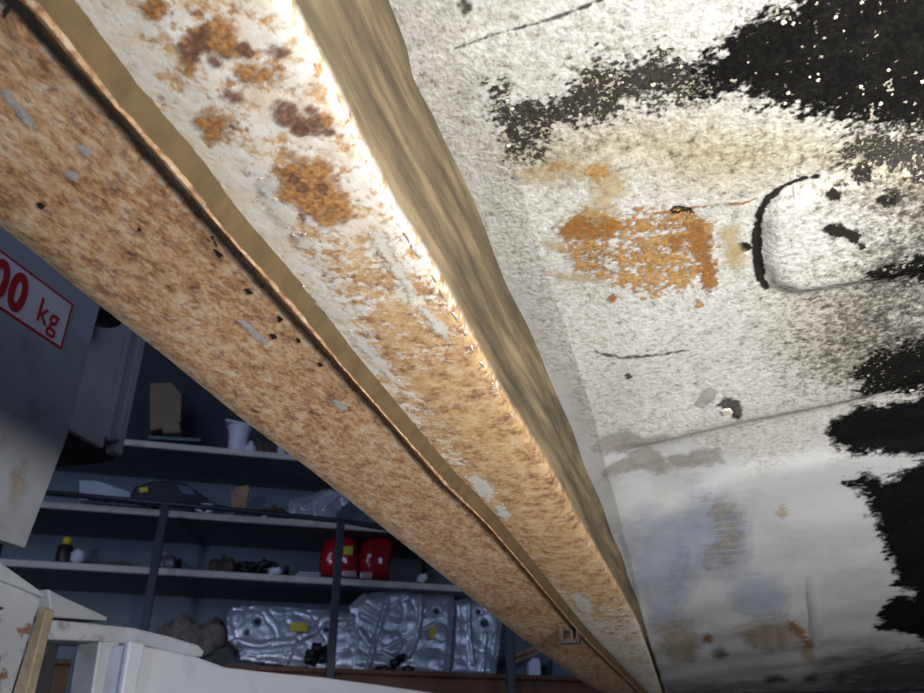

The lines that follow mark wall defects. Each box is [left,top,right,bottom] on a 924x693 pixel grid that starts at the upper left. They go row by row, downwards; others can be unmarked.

corrosion [177,14,290,142]
corrosion [270,99,336,137]
crack [455,0,603,49]
corrosion [272,153,359,232]
corrosion [517,160,746,308]
crack [655,174,820,290]